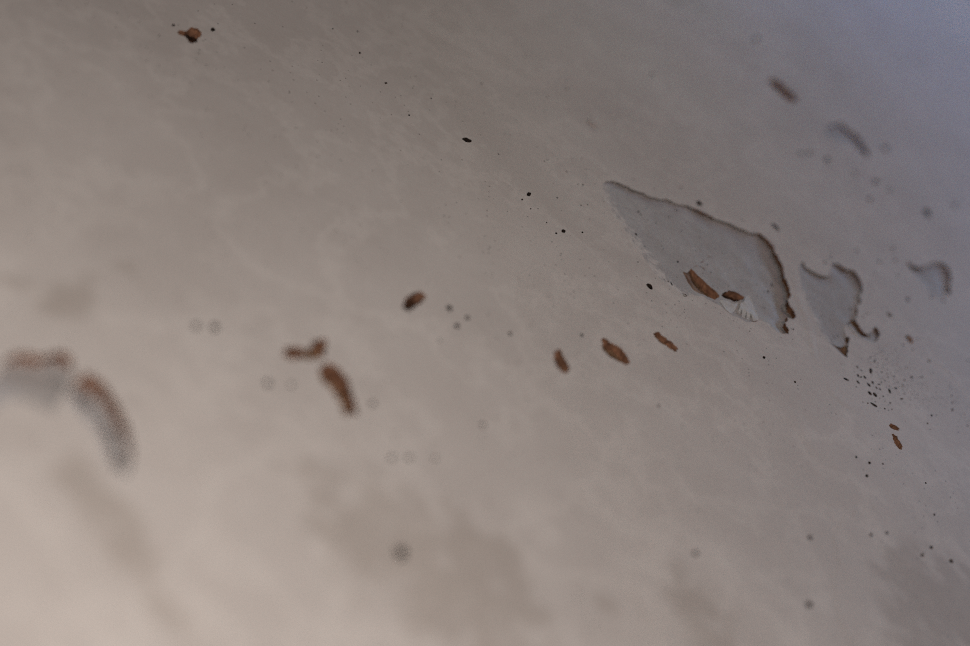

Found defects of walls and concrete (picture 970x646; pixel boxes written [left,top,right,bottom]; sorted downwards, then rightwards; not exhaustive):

spalling [769,79,797,102]
spalling [825,123,870,156]
spalling [603,181,880,357]
spalling [907,261,951,299]
spalling [553,349,570,373]
spalling [601,338,630,365]